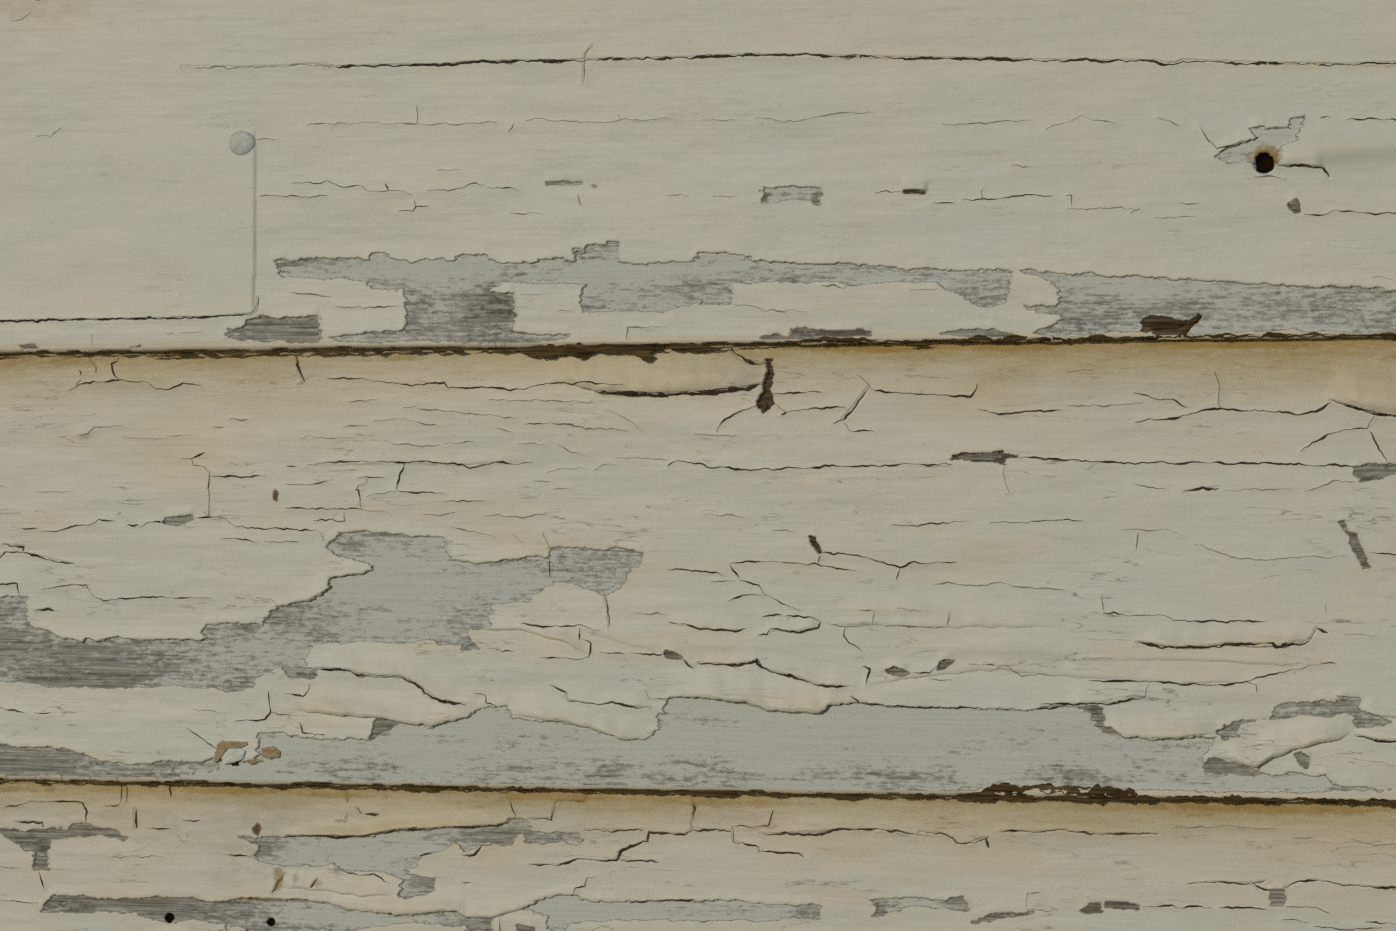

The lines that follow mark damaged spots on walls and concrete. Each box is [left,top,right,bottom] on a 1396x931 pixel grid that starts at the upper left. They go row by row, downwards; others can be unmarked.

crack [191,47,1396,73]
corrosion [1255,147,1279,162]
peeling [226,242,1396,343]
crack [80,347,1396,576]
crack [0,519,205,611]
peeling [1340,522,1370,568]
peeling [0,531,1396,793]
crack [489,530,1396,711]
peeling [0,823,126,870]
peeling [42,819,822,931]
crack [272,792,1313,893]
crack [1143,879,1396,931]